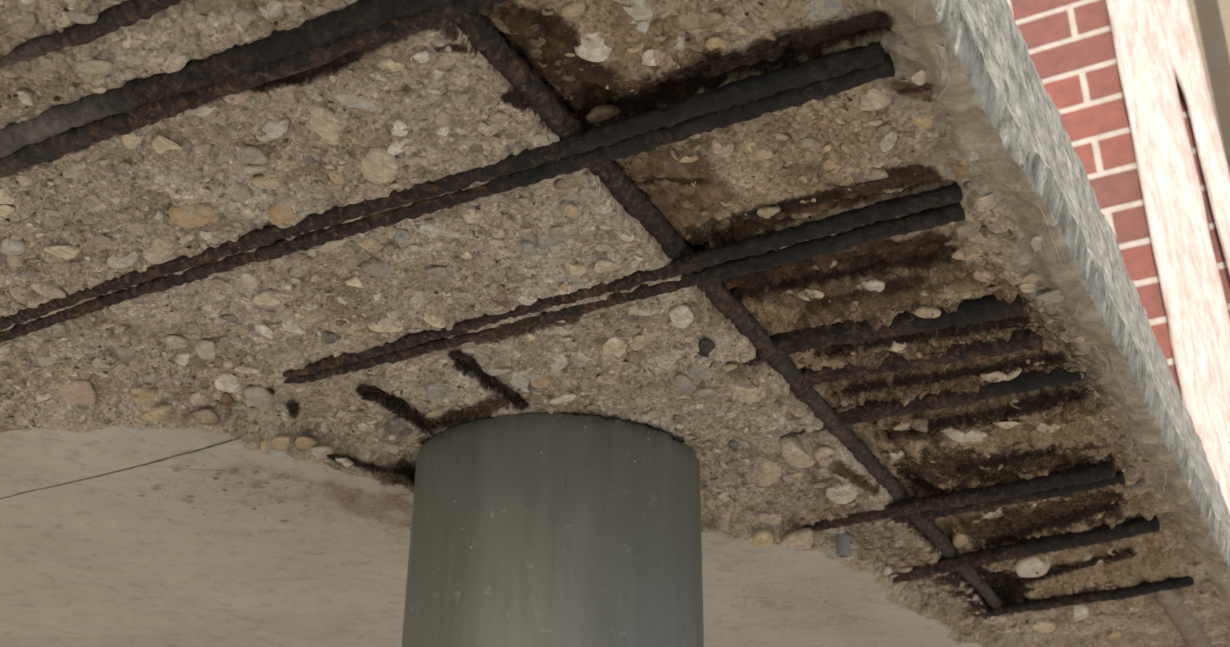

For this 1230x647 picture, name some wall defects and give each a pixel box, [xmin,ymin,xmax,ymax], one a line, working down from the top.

spalling [0,0,583,317]
rust [246,23,477,93]
rust [477,0,721,126]
spalling [581,105,620,126]
rust [617,142,942,253]
rust [891,83,932,102]
crack [1,437,241,499]
spalling [0,160,1188,647]
rust [562,412,685,444]
rust [756,240,1115,498]
rust [955,489,1125,549]
rust [850,520,1134,634]